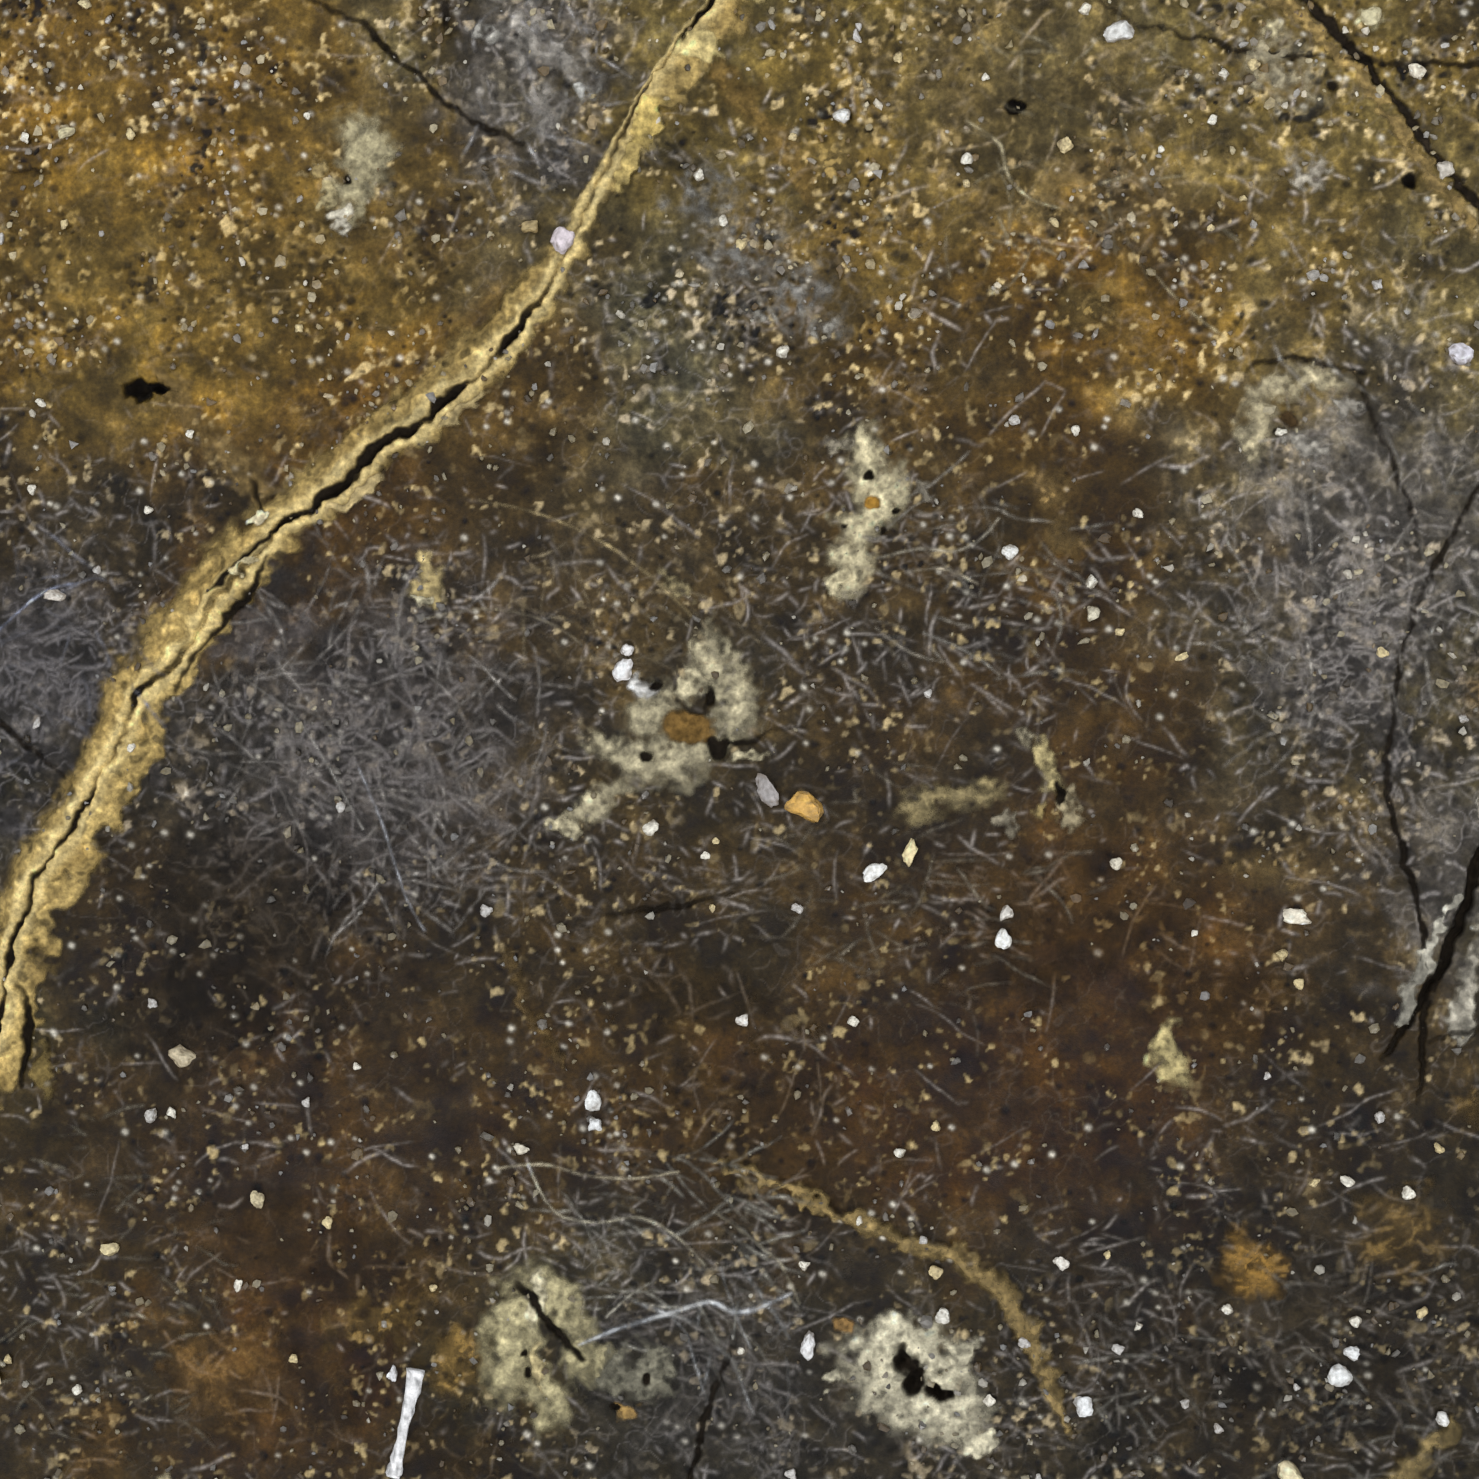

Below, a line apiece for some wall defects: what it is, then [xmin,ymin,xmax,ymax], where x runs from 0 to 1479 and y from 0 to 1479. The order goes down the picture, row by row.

crack [1100,0,1479,242]
crack [0,0,765,1099]
crack [1250,354,1479,1093]